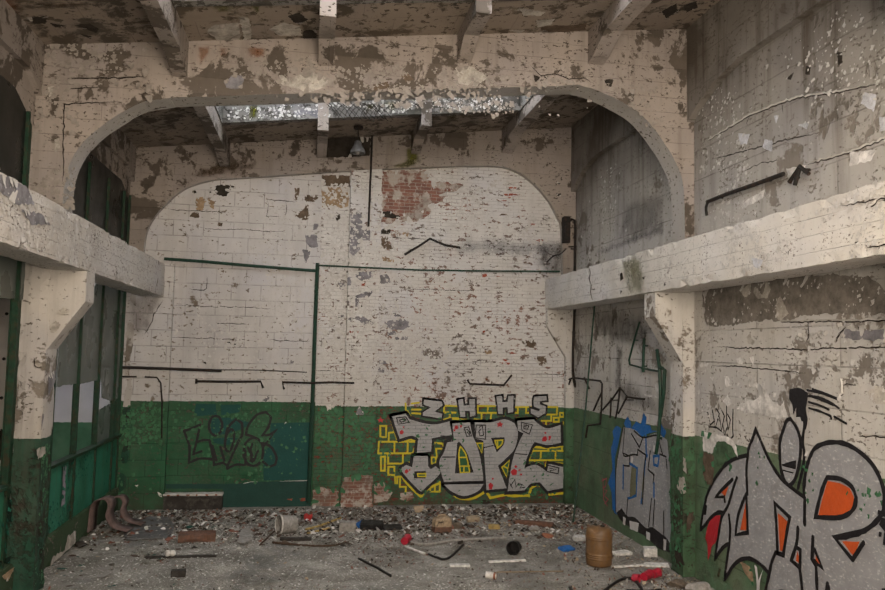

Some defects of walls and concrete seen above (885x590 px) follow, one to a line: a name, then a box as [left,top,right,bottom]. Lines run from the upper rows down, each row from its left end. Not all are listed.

peeling [26,16,65,28]
peeling [207,17,252,54]
peeling [268,13,317,39]
peeling [224,54,579,120]
peeling [662,1,698,19]
peeling [785,12,885,142]
peeling [0,23,165,295]
peeling [117,170,555,511]
peeling [526,87,885,569]
peeling [36,444,51,533]